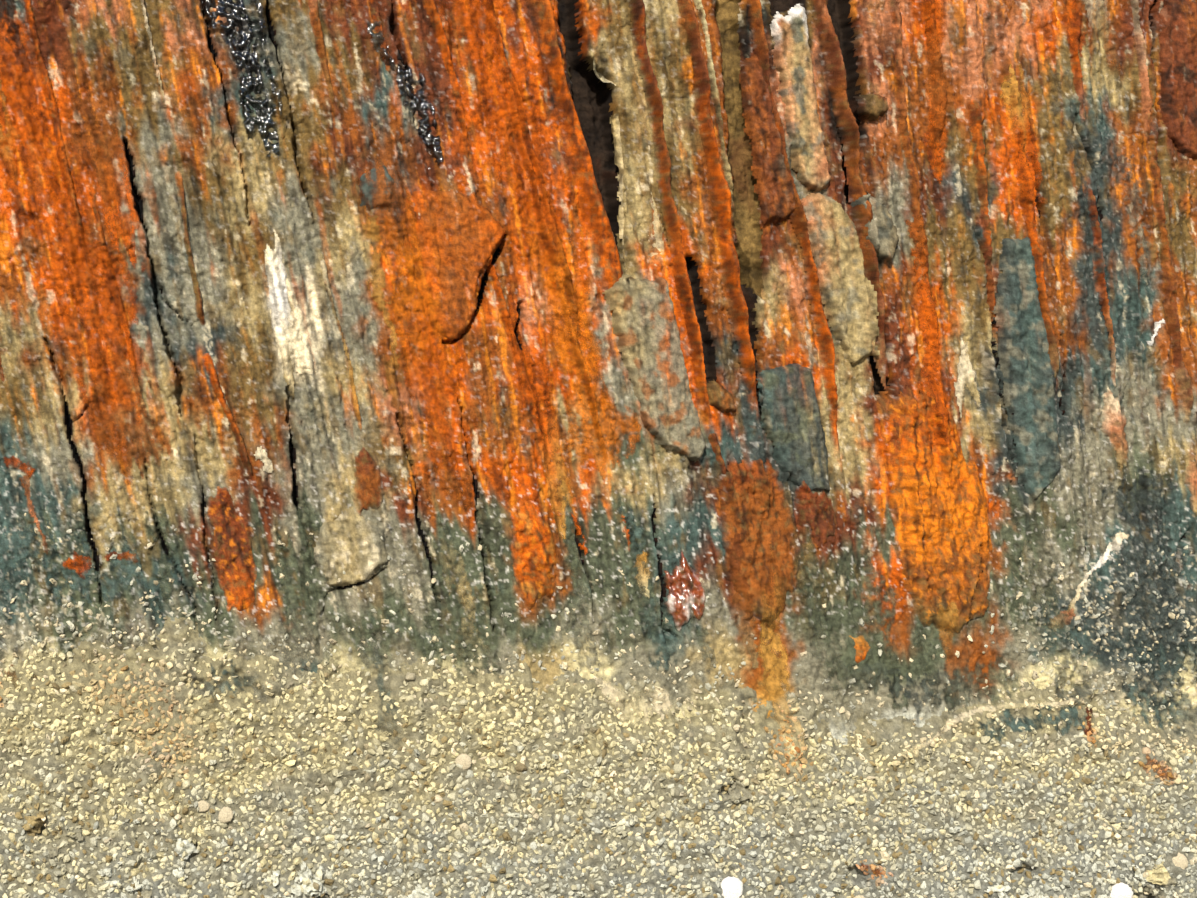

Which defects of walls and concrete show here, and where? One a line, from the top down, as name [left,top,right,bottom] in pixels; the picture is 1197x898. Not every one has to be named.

corrosion [0,0,172,483]
crack [123,139,143,224]
corrosion [357,0,736,554]
corrosion [992,237,1061,501]
corrosion [1157,0,1197,159]
crack [64,402,101,571]
water stain [0,495,174,615]
crack [199,493,207,523]
crack [415,489,433,587]
water stain [563,497,675,723]
water stain [794,527,1099,755]
water stain [1050,469,1197,734]